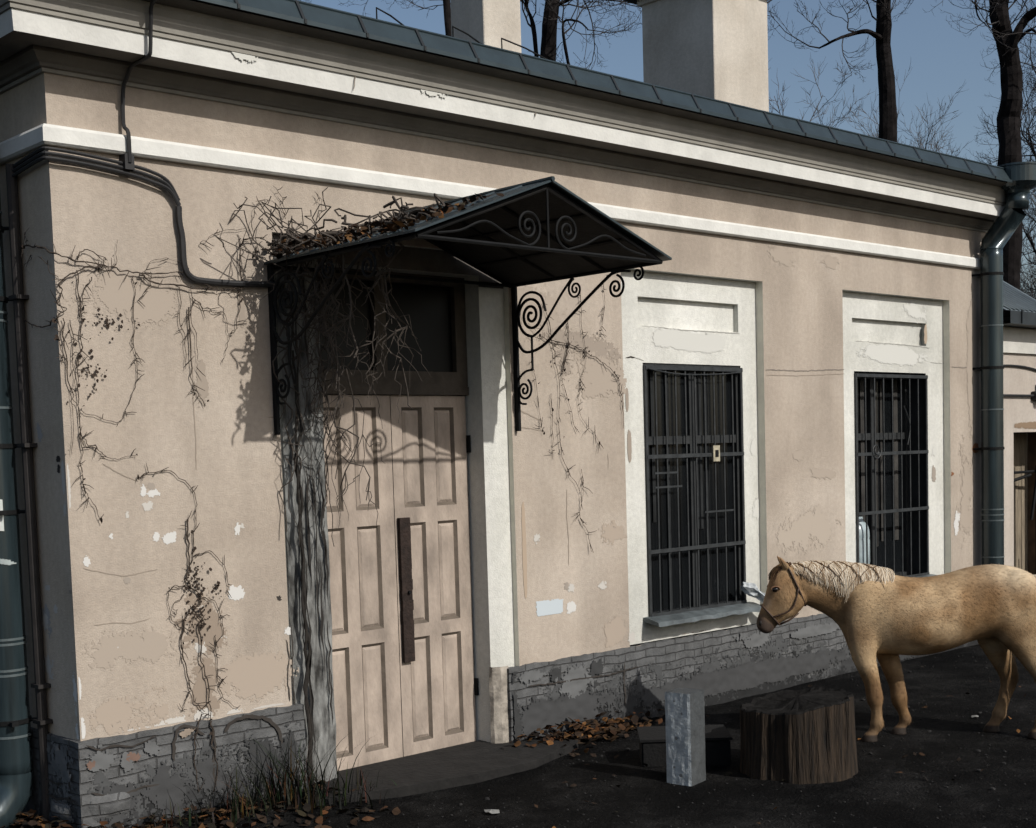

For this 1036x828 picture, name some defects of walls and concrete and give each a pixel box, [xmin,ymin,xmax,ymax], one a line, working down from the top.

flaking render [140,483,160,511]
flaking render [153,531,176,545]
flaking render [228,585,245,601]
peeling [729,630,773,650]
peeling [519,664,595,699]
flaking render [227,703,284,714]
peeling [47,675,214,800]